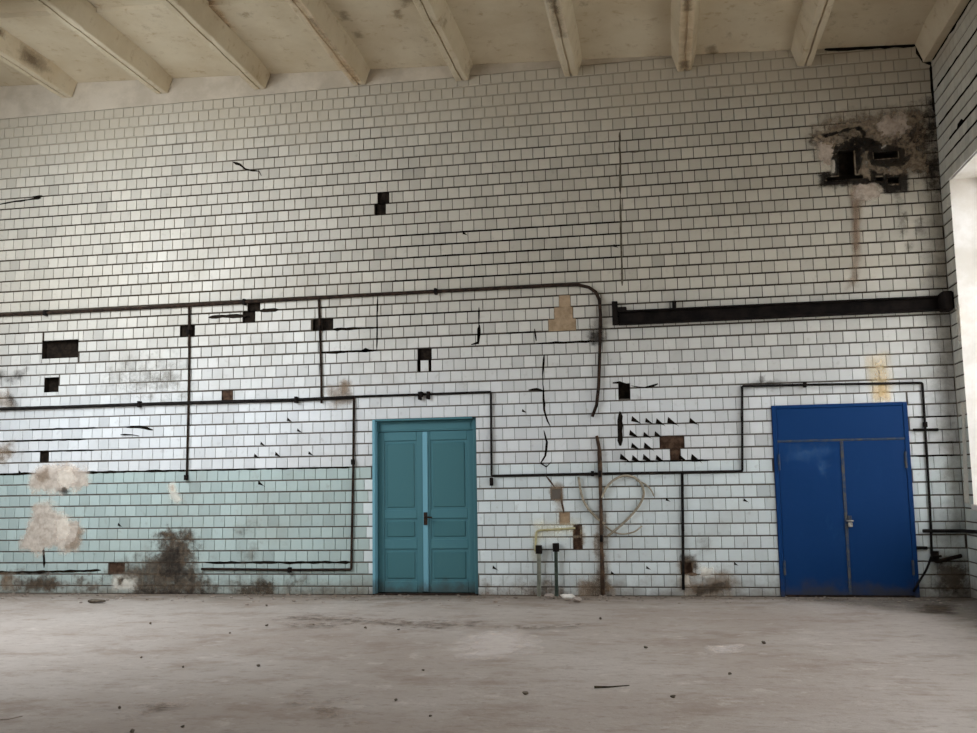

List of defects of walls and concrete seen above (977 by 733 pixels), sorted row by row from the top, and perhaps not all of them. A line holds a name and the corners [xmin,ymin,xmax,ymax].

flaking render [810,110,929,200]
peeling [375,192,389,215]
peeling [548,295,576,331]
peeling [42,339,79,359]
peeling [620,416,702,463]
flaking render [18,452,88,552]